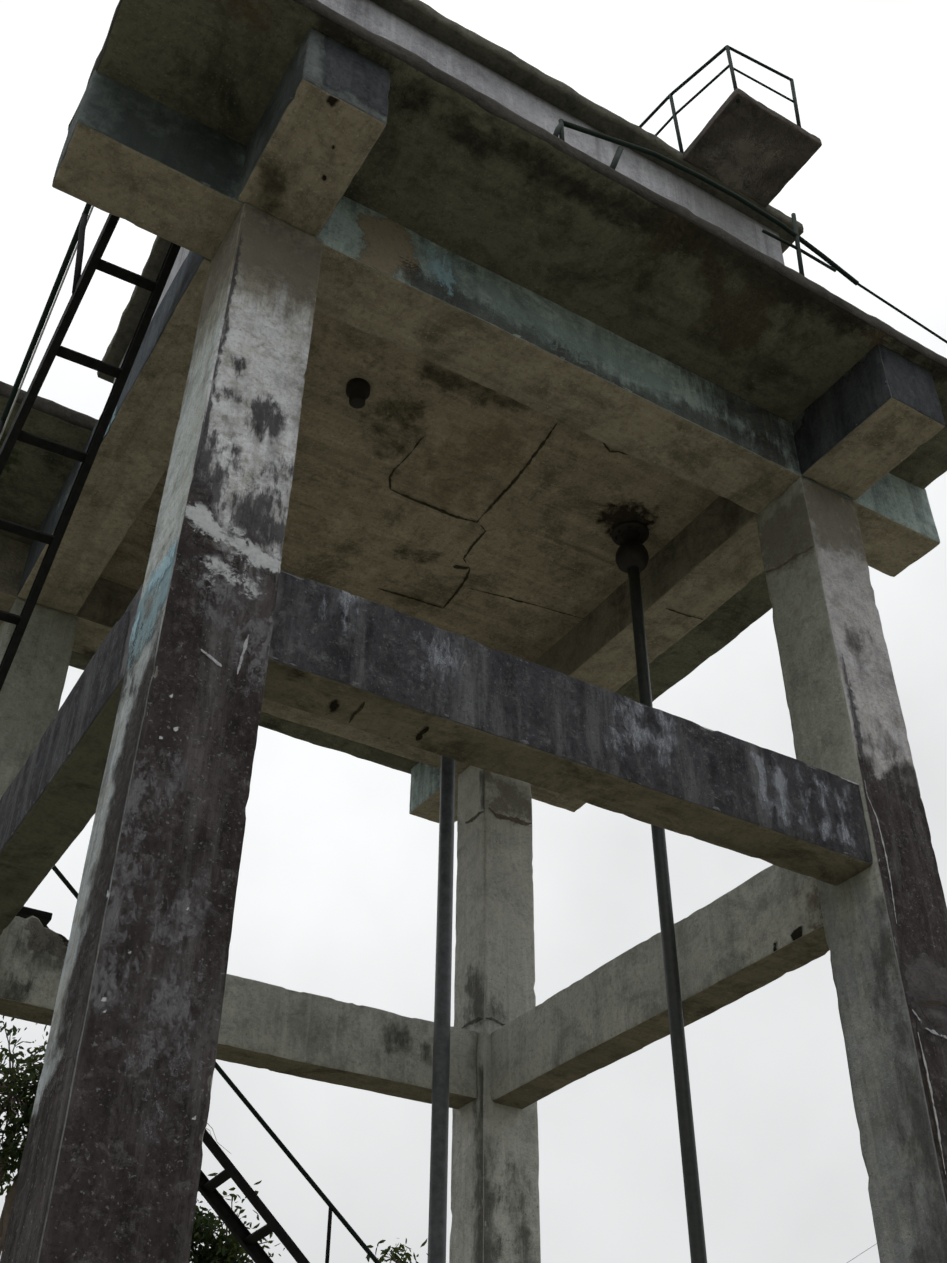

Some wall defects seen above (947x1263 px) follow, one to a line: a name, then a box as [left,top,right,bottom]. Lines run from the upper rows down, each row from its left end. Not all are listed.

leakage [186,207,322,527]
leakage [228,455,294,553]
crack [378,423,583,619]
leakage [400,116,947,574]
leakage [0,510,947,1263]
spalling [773,926,802,952]